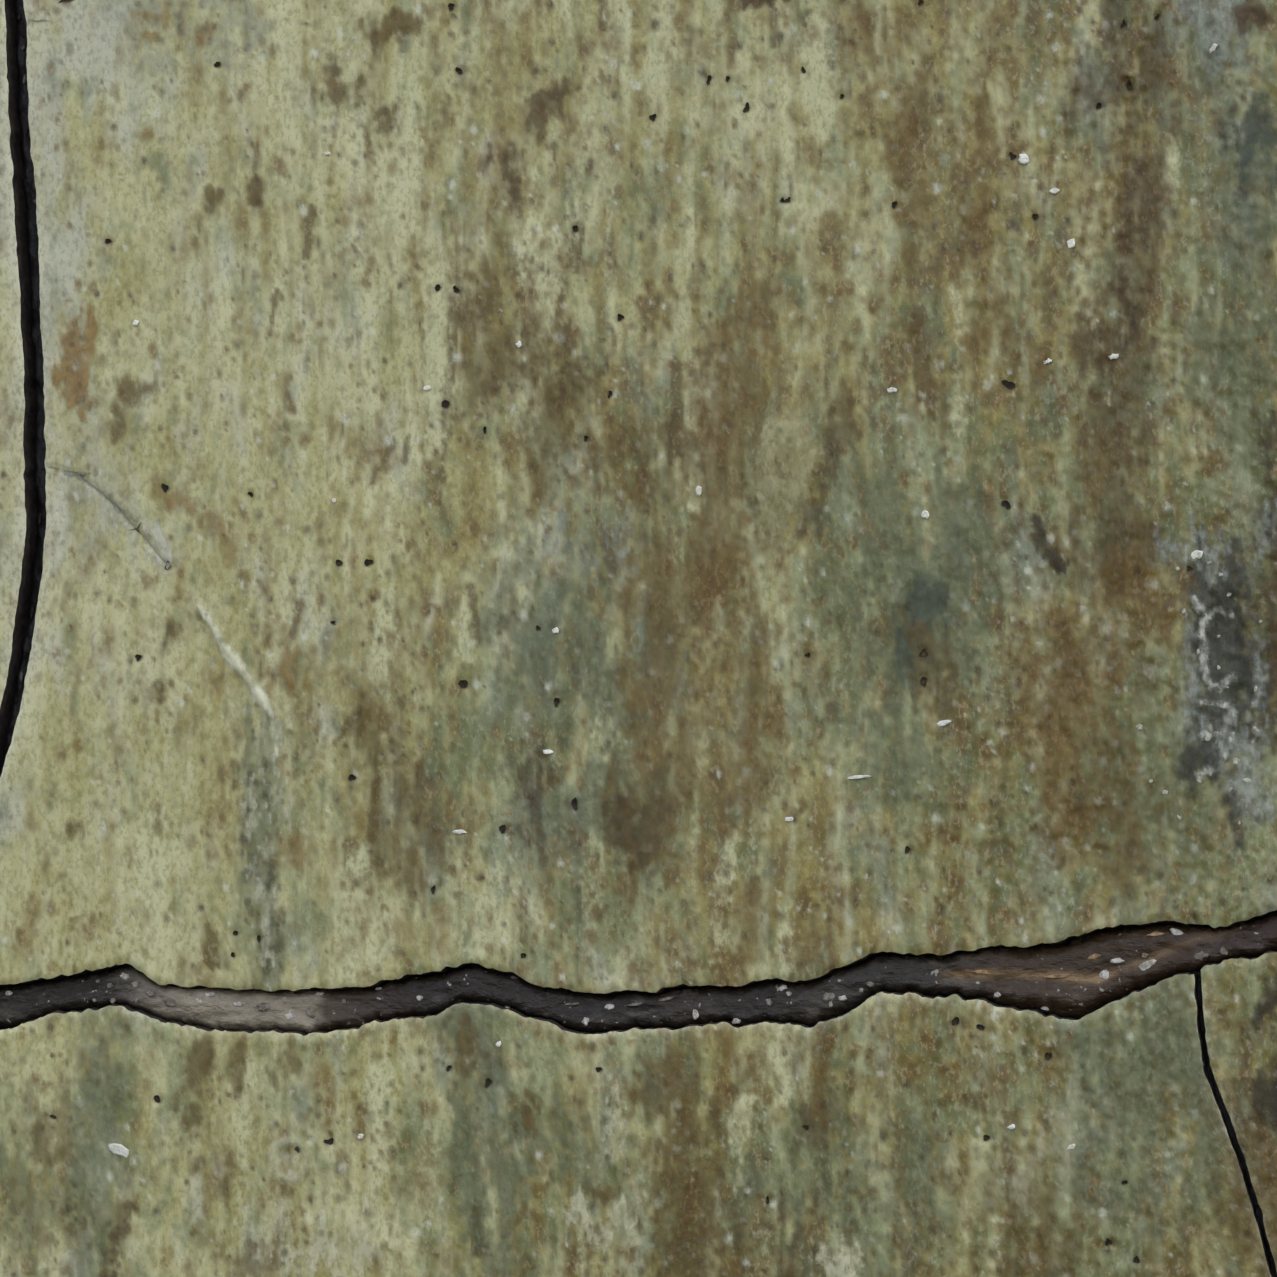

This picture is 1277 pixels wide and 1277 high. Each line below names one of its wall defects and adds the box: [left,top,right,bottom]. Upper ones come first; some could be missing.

rust [52,305,97,421]
crack [0,0,172,777]
crack [0,602,1277,1277]